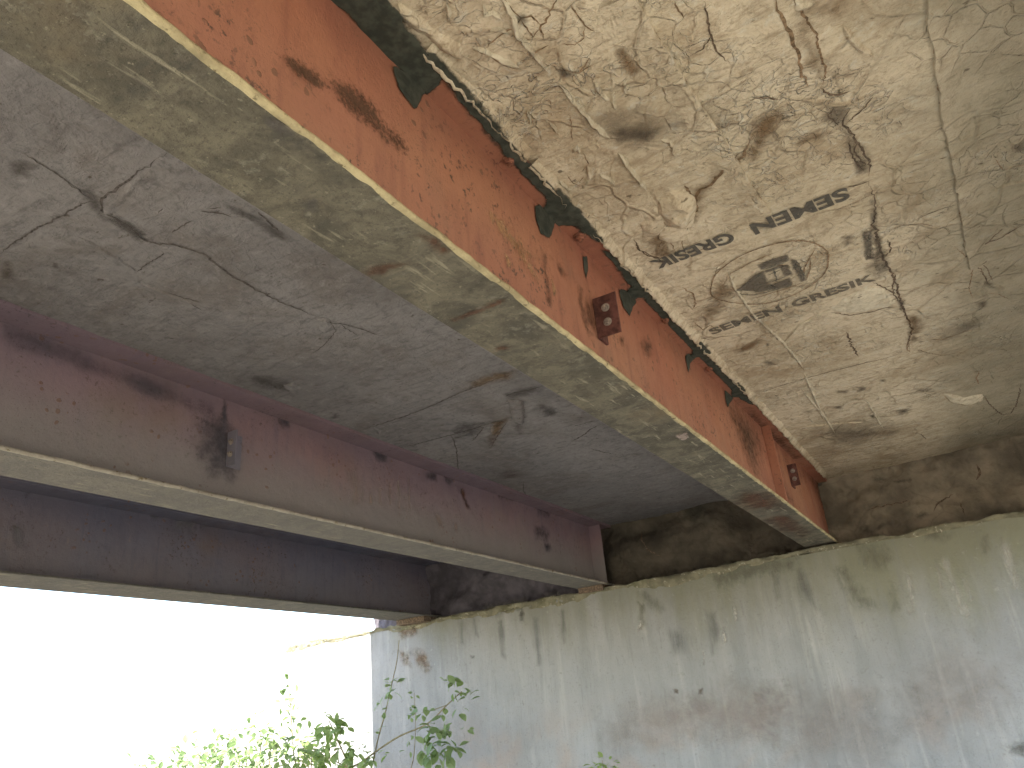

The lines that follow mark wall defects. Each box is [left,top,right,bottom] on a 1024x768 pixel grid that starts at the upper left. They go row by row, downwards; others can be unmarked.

crack [674,1,725,60]
rust [286,56,407,150]
crack [2,153,380,353]
crack [635,135,753,274]
crack [763,0,1023,415]
crack [681,288,721,340]
crack [360,373,542,469]
peeling [944,393,984,405]